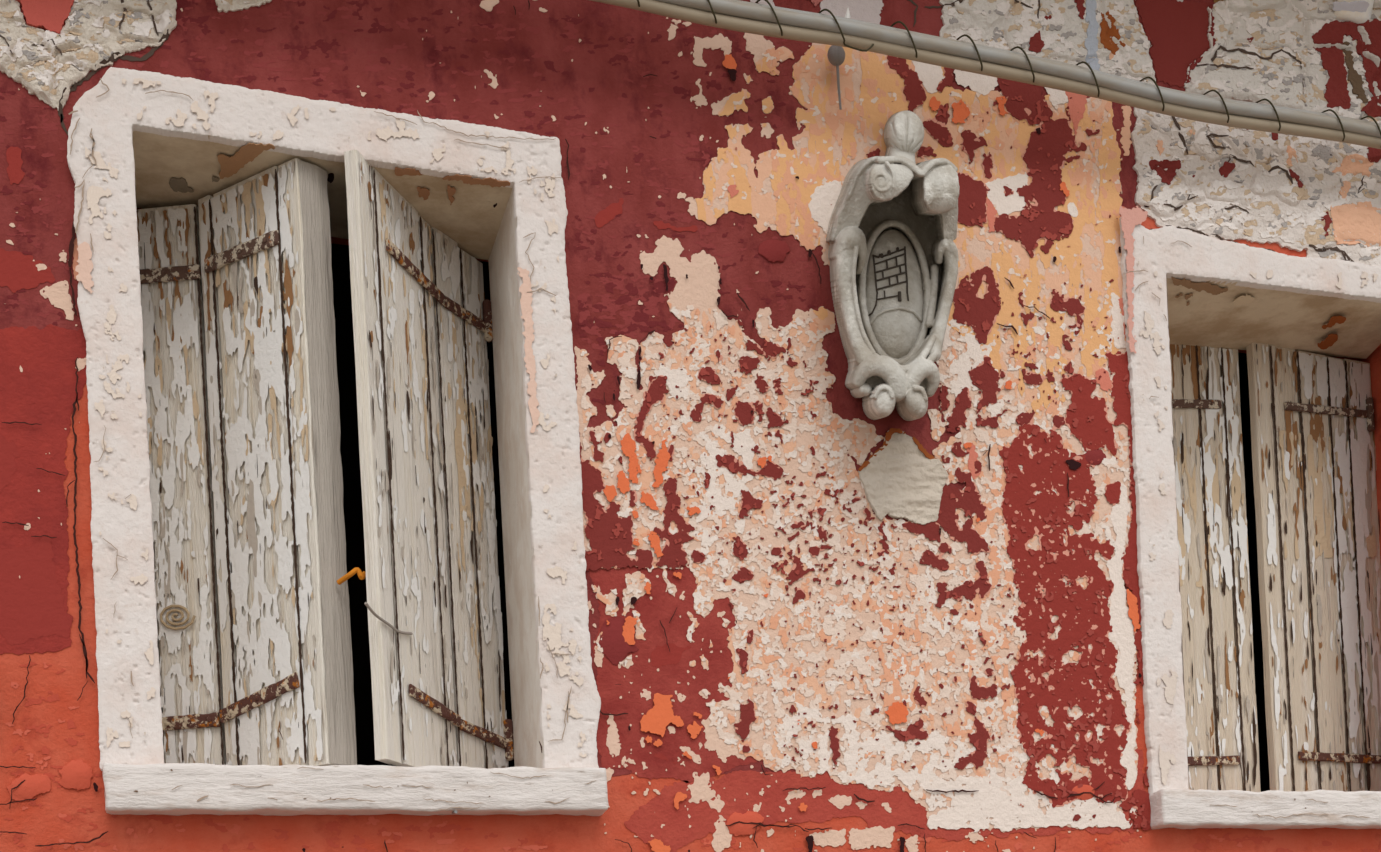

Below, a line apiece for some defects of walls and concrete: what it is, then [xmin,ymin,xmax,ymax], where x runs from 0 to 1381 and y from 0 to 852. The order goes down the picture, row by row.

flaking render [215,0,272,13]
flaking render [0,0,183,110]
crack [1196,45,1302,69]
crack [1172,116,1293,184]
peeling [574,0,1381,852]
crack [1,357,128,701]
peeling [542,604,571,677]
crack [12,655,31,724]